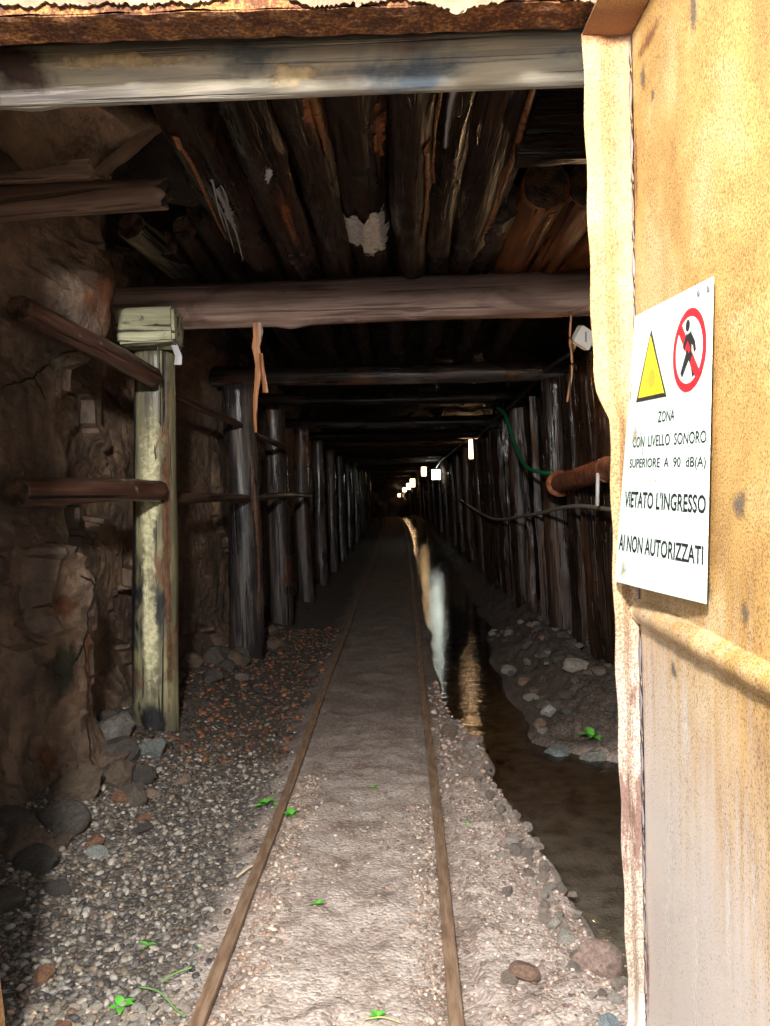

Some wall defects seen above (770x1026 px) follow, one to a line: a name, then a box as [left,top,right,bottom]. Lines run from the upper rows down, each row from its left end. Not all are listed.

peeling [0,0,223,9]
peeling [290,0,388,9]
peeling [407,0,508,15]